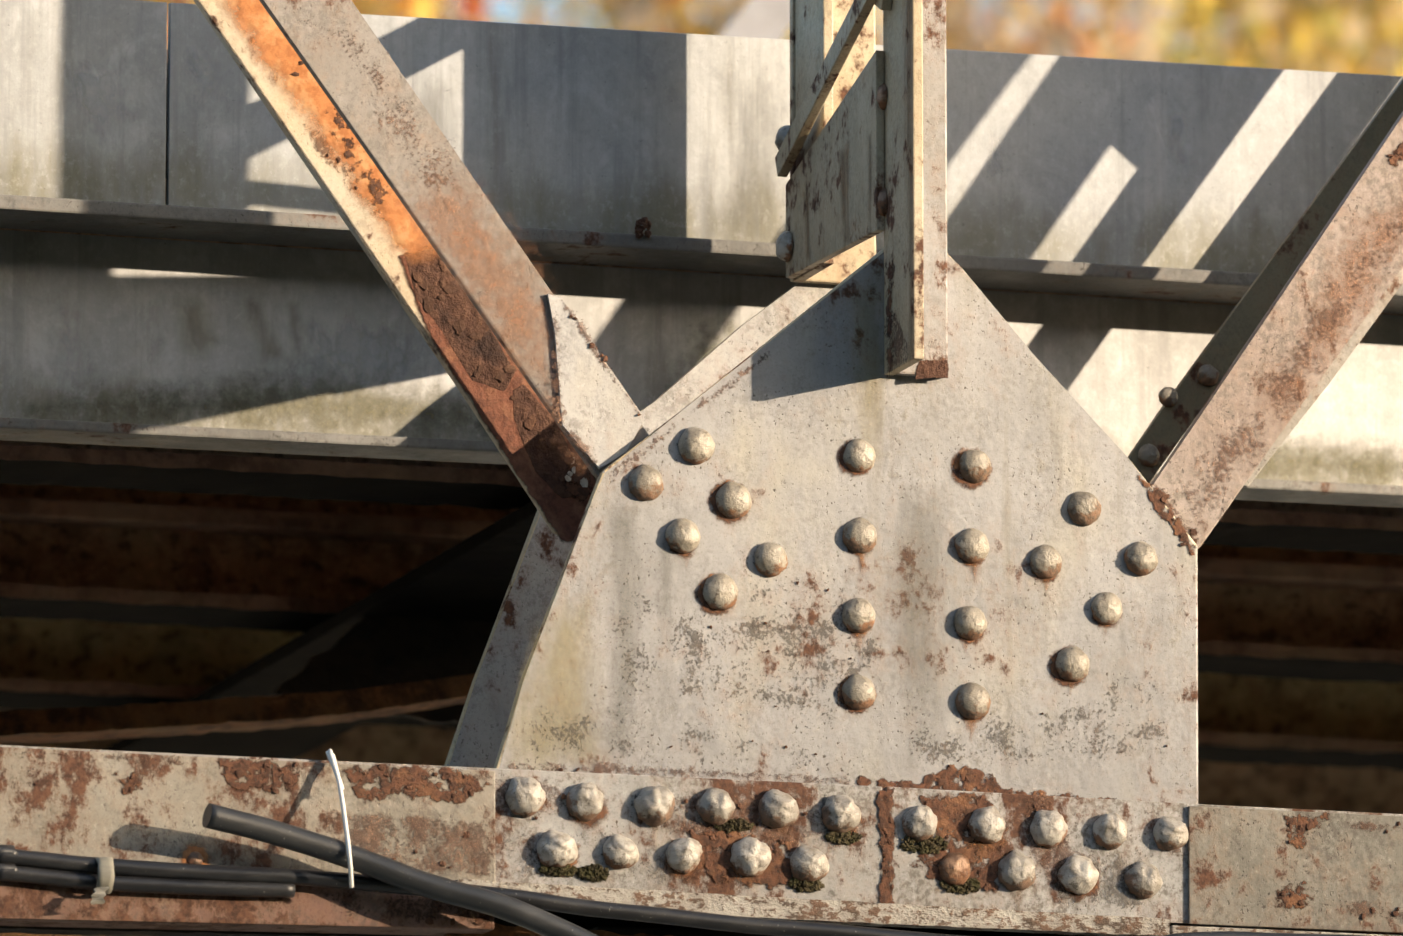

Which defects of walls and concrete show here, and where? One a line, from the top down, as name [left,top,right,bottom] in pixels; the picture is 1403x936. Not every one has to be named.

corrosion [1388,142,1403,166]
corrosion [226,0,615,542]
corrosion [1138,211,1403,568]
corrosion [708,480,747,524]
corrosion [695,574,732,615]
corrosion [1048,645,1086,688]
corrosion [837,676,874,714]
corrosion [107,754,184,795]
corrosion [218,756,324,794]
corrosion [325,760,1117,904]
corrosion [1284,811,1330,849]
corrosion [1275,881,1314,909]